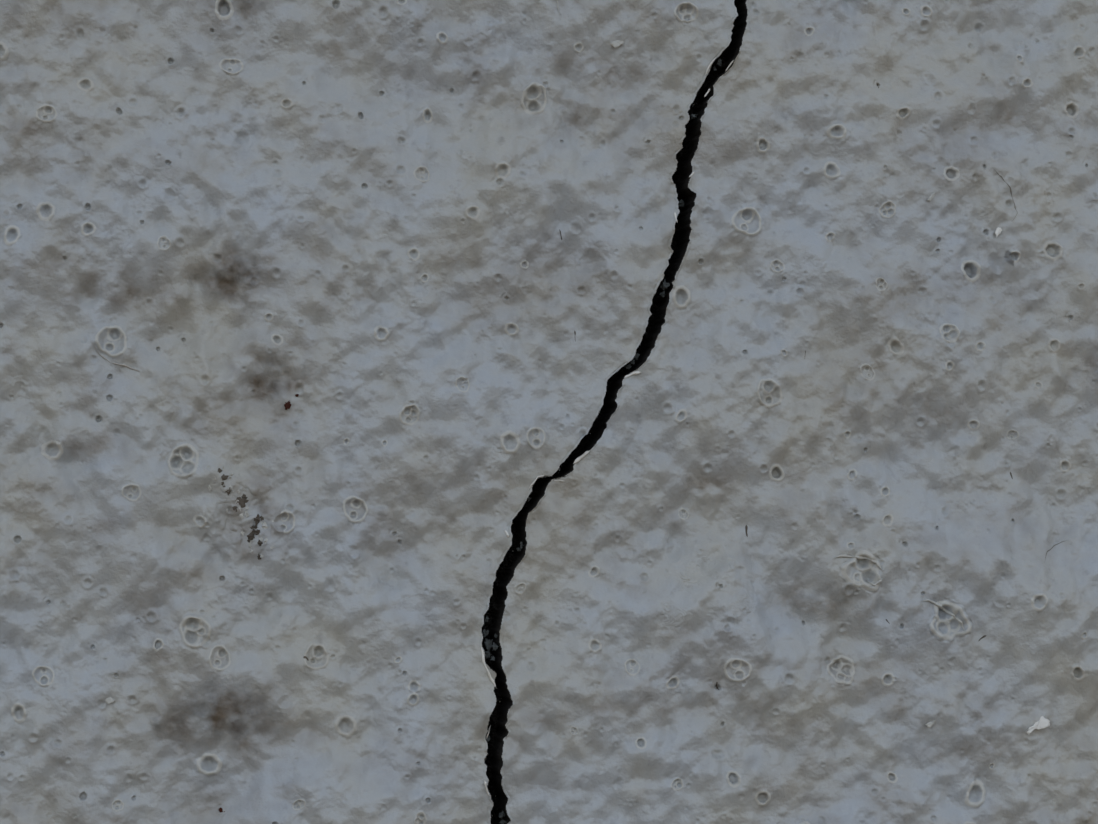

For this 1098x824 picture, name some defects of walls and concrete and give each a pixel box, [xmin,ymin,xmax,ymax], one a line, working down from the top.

crack [479,0,750,824]